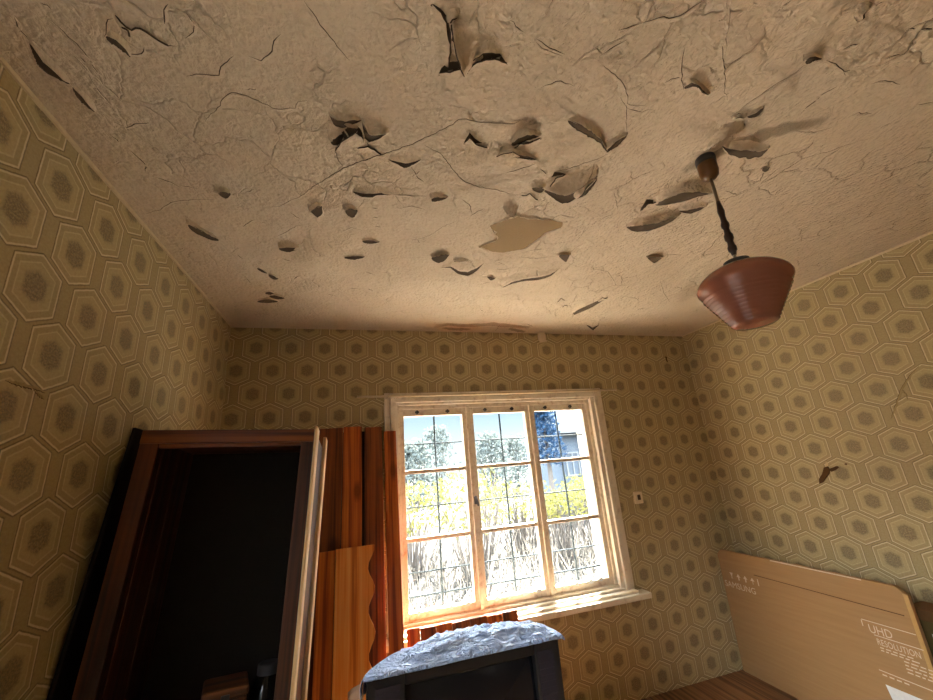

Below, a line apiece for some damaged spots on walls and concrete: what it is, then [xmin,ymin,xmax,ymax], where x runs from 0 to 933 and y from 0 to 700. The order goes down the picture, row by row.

crack [186,34,310,122]
crack [303,0,350,61]
peeling [430,4,507,77]
crack [510,20,565,57]
crack [601,0,705,133]
crack [731,44,858,117]
peeling [328,112,421,170]
crack [243,119,605,242]
spalling [429,164,599,288]
peeling [496,128,542,162]
peeling [565,116,628,154]
peeling [625,182,713,233]